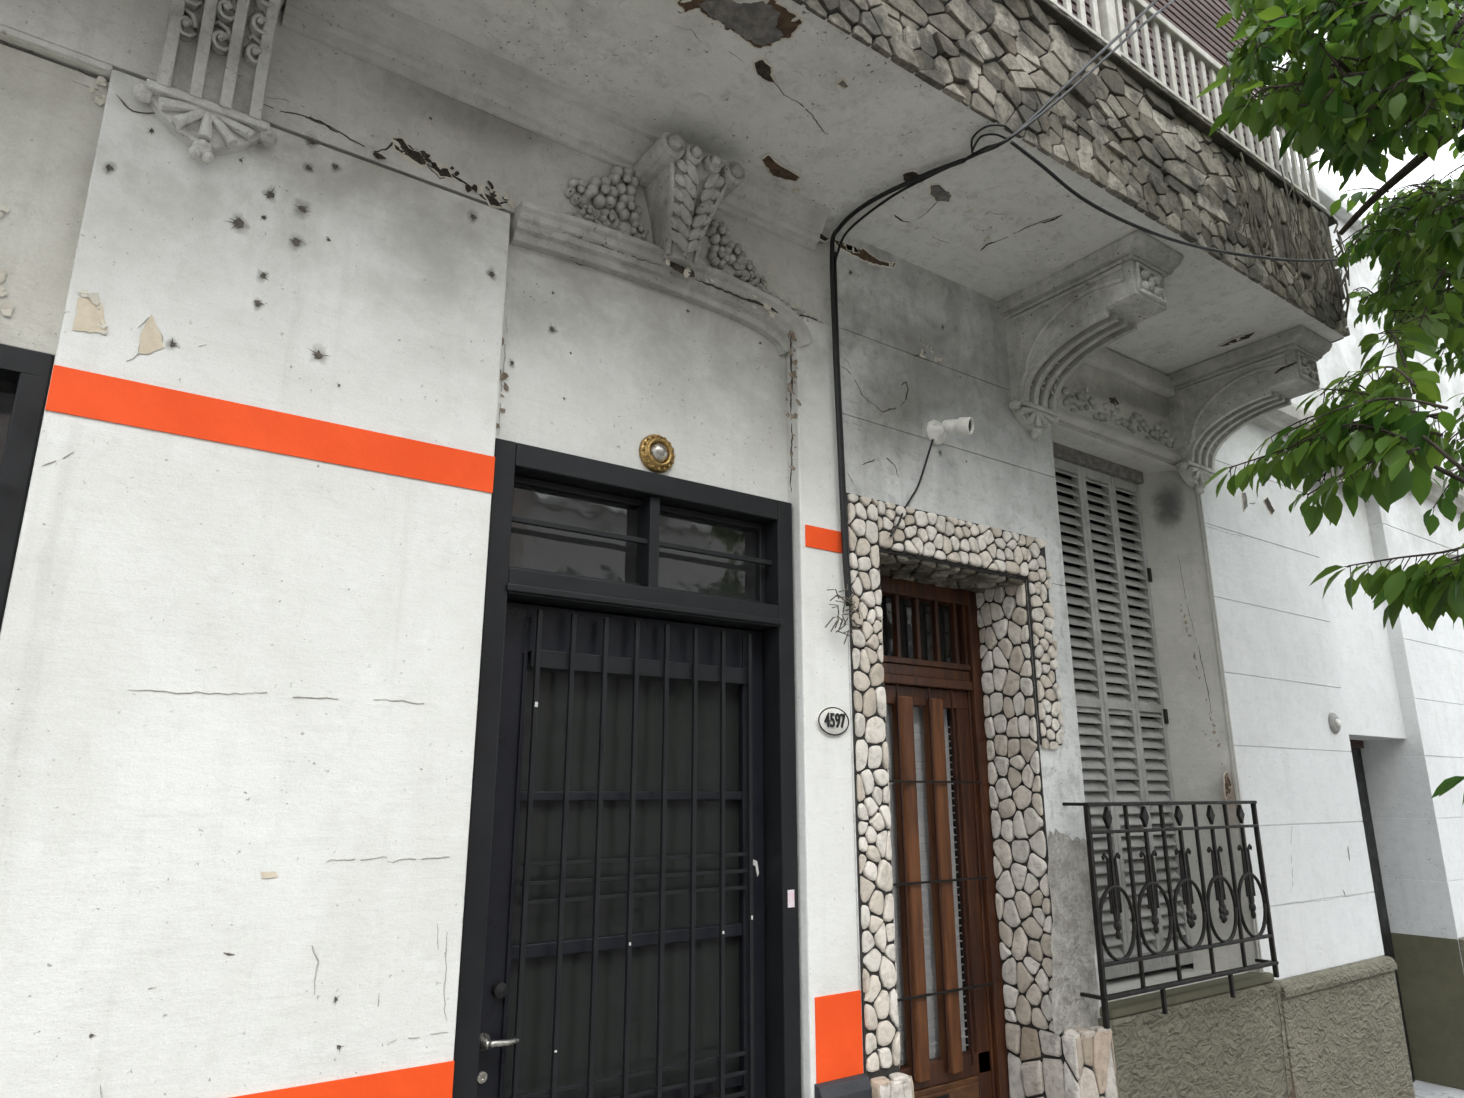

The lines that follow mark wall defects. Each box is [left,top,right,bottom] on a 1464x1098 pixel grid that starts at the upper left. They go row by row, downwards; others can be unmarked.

spalling [675,0,827,134]
crack [264,97,365,147]
spalling [373,136,515,209]
spalling [760,153,802,193]
spalling [894,170,1062,251]
spalling [819,233,896,269]
peeling [72,290,108,334]
peeling [127,314,164,361]
crack [138,689,338,700]